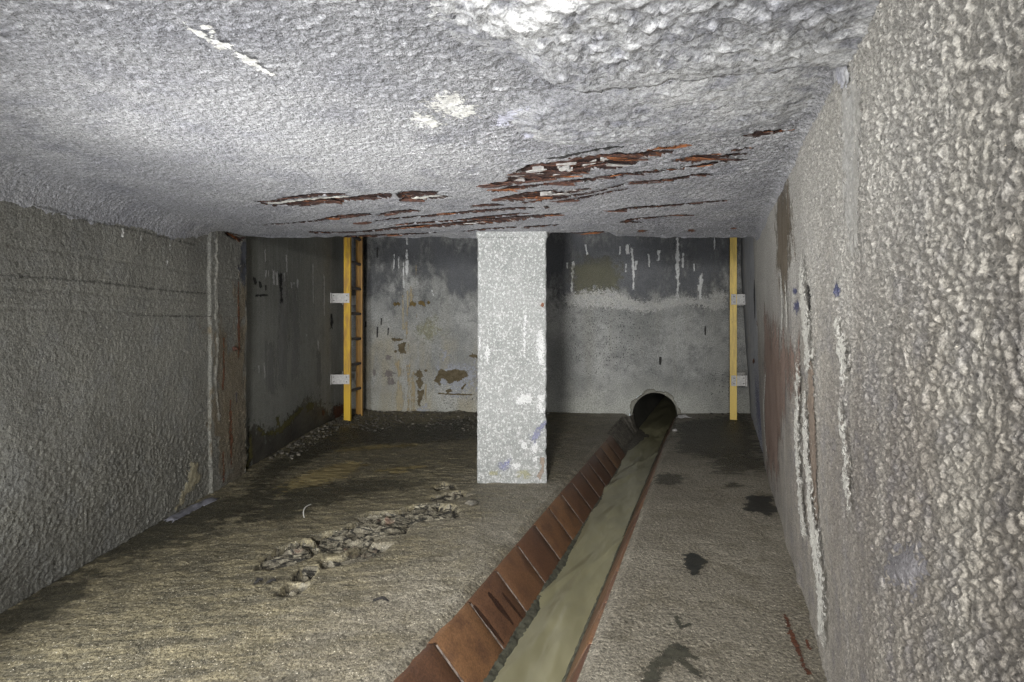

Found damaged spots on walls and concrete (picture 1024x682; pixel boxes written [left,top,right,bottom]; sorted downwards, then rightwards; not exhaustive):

spalling [257,129,795,238]
water stain [546,232,739,316]
peeling [414,368,473,406]
water stain [832,316,851,516]